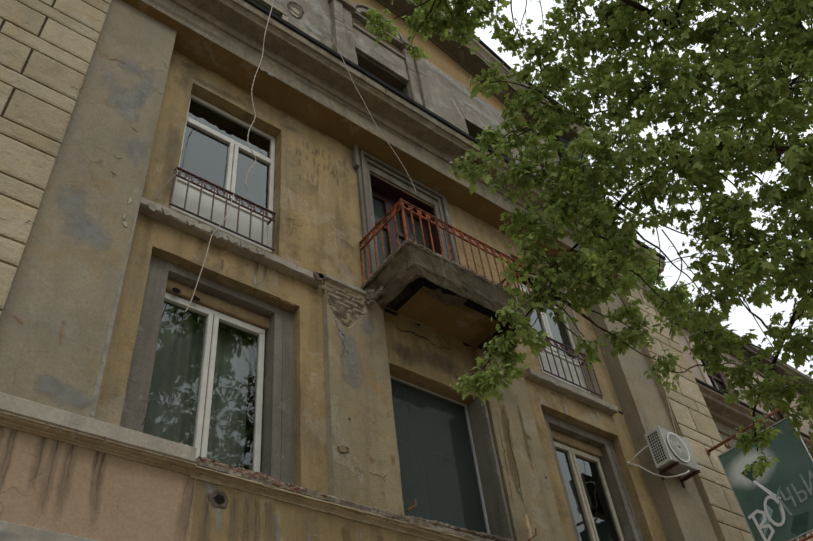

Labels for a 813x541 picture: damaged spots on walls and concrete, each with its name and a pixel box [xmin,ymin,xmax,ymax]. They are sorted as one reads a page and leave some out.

spalling [313,272,384,342]
spalling [208,489,228,509]